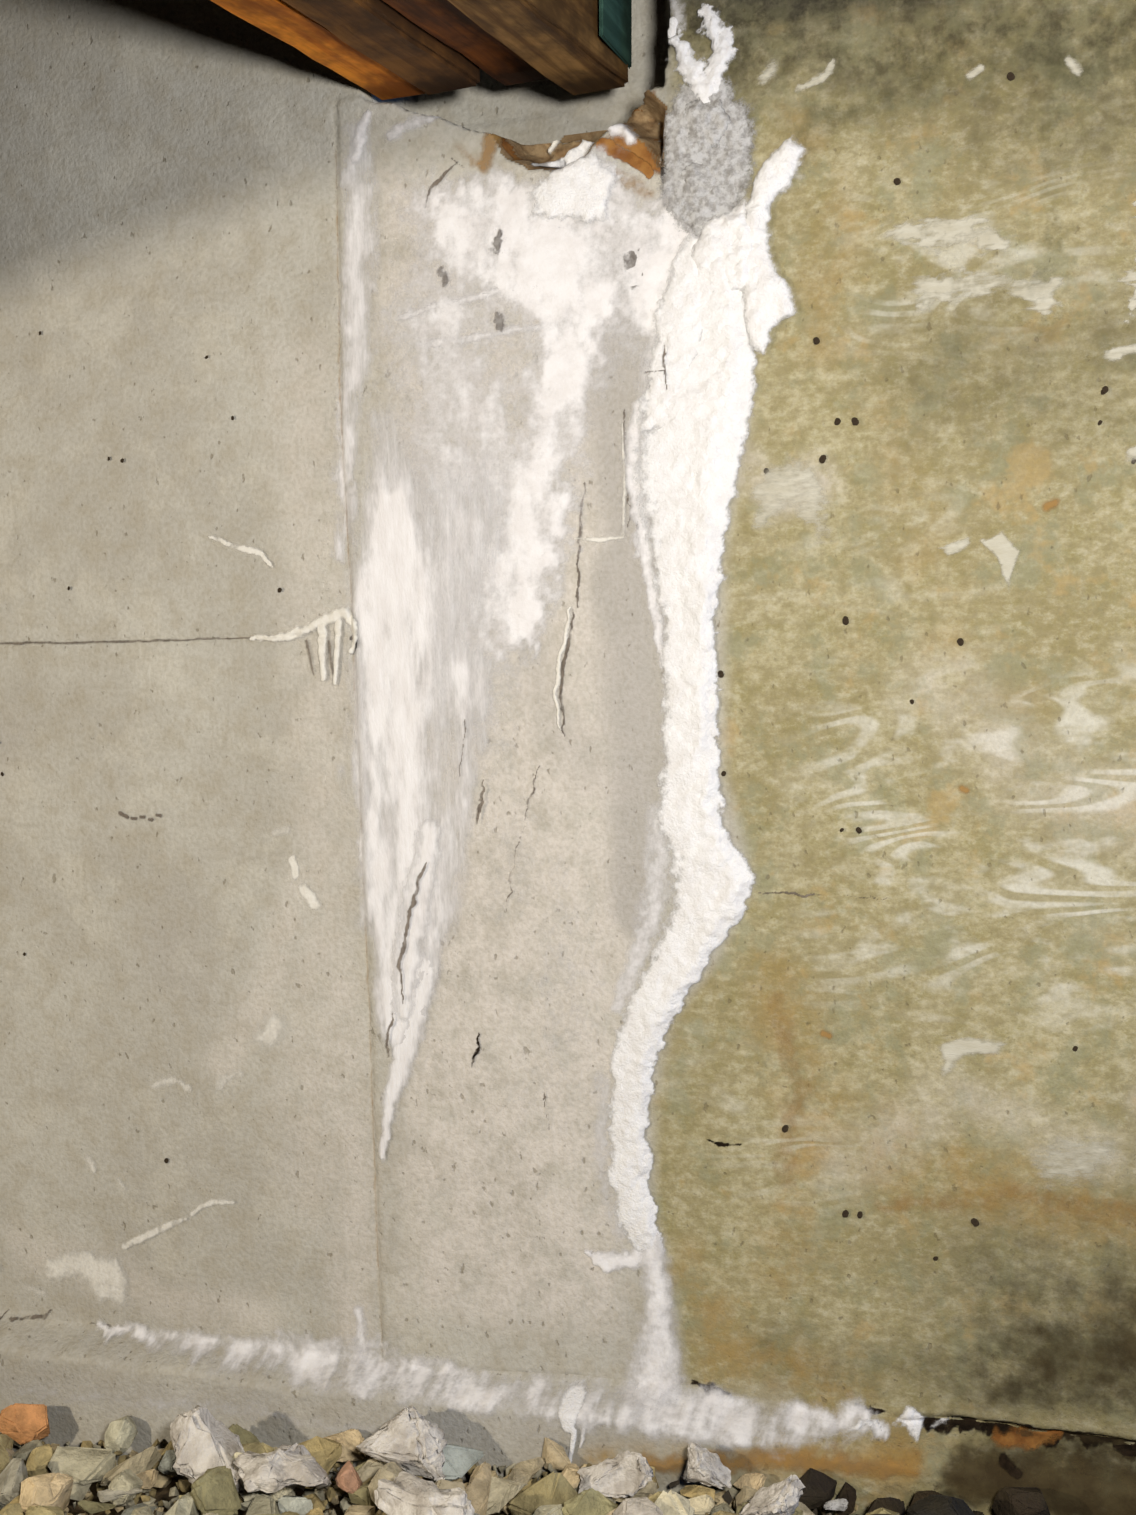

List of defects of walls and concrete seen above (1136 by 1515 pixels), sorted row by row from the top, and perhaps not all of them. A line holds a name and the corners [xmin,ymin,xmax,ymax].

damp [668,3,737,103]
spalling [494,75,755,236]
crack [623,409,640,527]
crack [553,483,585,736]
crack [459,720,485,824]
damp [97,110,946,1478]
crack [386,862,427,1053]
damp [1032,1301,1136,1384]